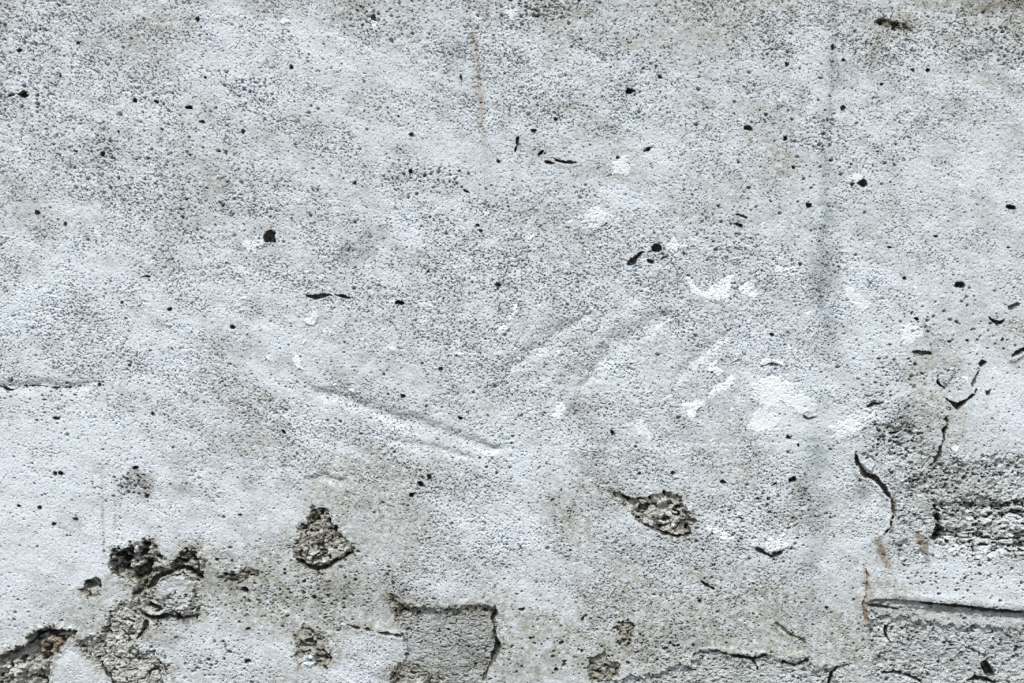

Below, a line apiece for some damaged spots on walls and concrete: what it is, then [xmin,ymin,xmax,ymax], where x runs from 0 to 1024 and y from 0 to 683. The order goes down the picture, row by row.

crack [929,416,949,466]
spalling [292,504,358,572]
spalling [606,489,735,542]
crack [854,453,895,535]
spalling [0,537,260,683]
spalling [346,593,513,683]